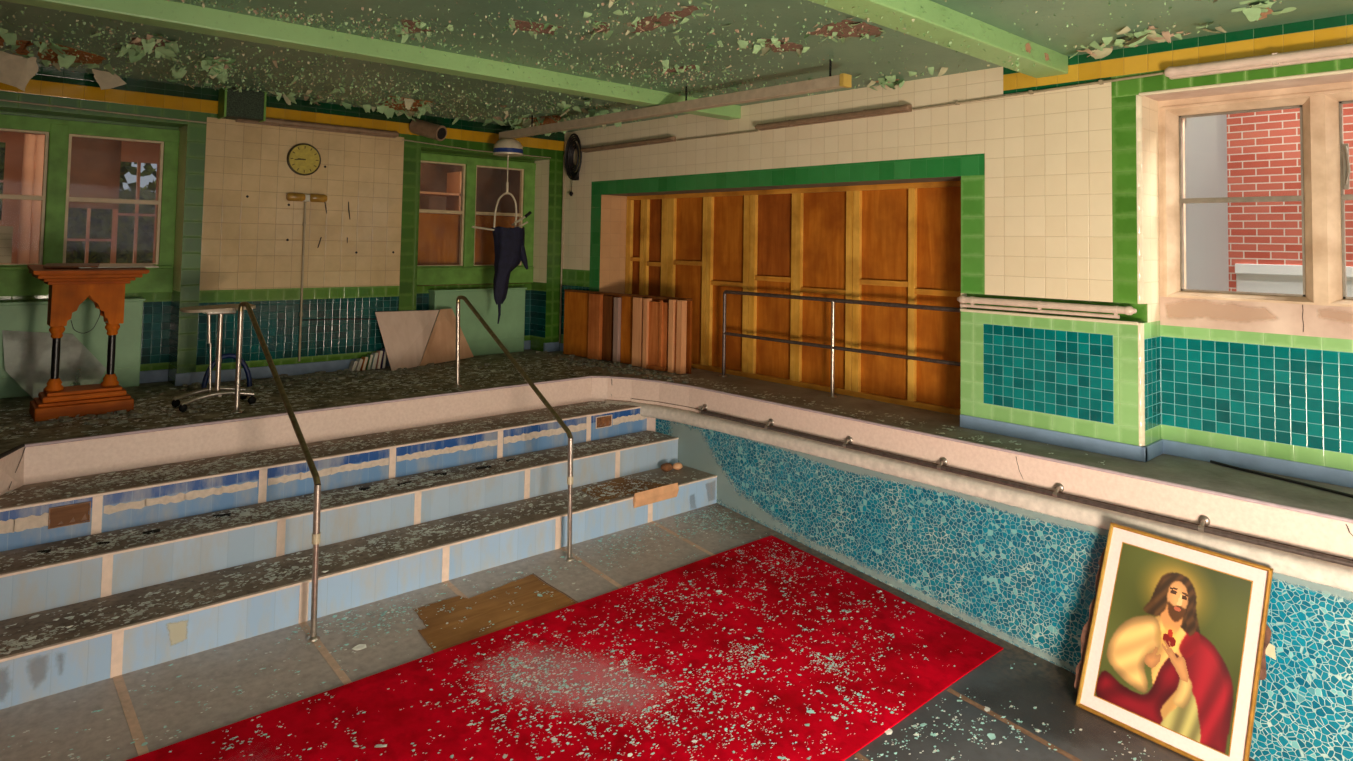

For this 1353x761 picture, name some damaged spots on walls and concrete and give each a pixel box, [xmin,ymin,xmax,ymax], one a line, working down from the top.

peeling [0,0,1227,136]
peeling [1231,0,1297,22]